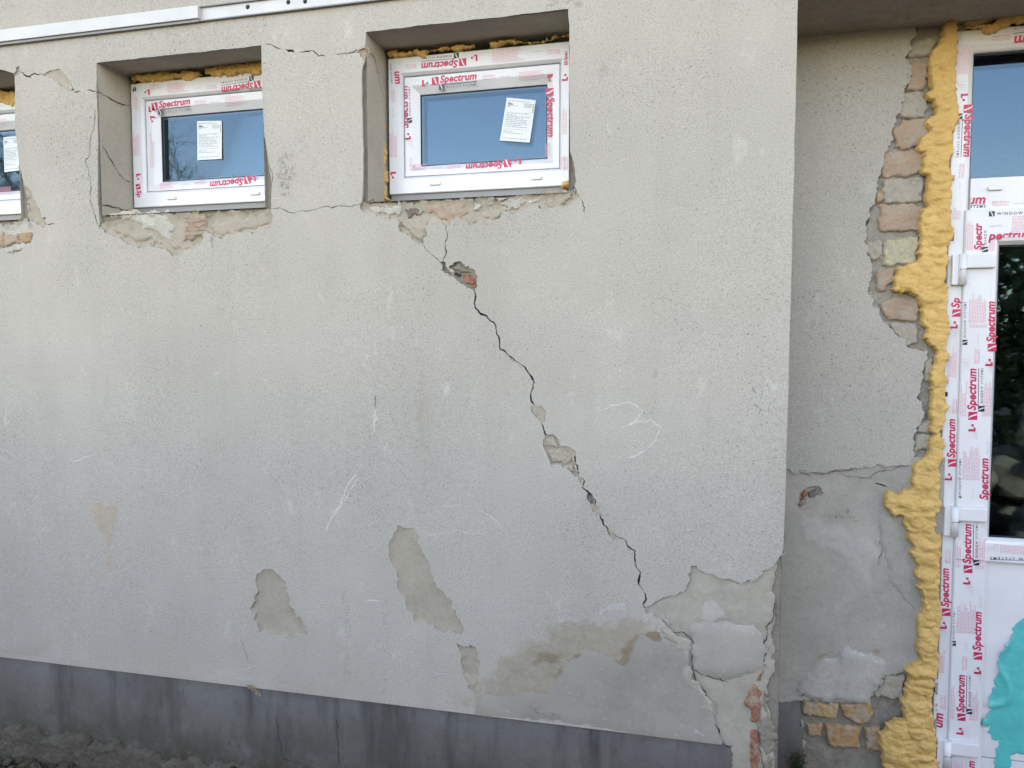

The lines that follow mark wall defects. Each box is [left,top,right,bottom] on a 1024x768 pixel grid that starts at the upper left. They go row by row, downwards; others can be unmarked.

flaking render [0,166,47,255]
flaking render [100,208,273,255]
flaking render [361,190,579,244]
flaking render [864,27,942,457]
crack [475,297,557,438]
crack [574,455,647,604]
flaking render [795,486,823,510]
flaking render [251,569,307,637]
flaking render [388,526,480,693]
flaking render [643,555,782,768]
flaking render [799,672,907,768]